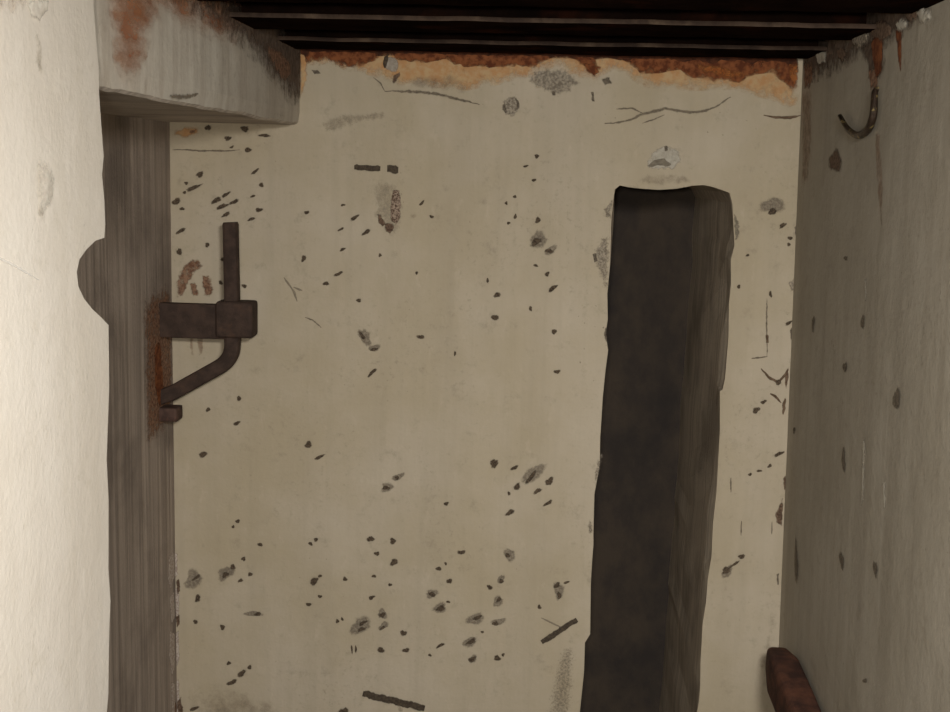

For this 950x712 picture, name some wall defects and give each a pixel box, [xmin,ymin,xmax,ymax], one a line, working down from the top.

rust [113,0,149,66]
rust [170,0,813,103]
peeling [531,70,577,95]
rust [868,37,883,88]
crack [605,97,731,124]
spalling [648,146,680,169]
spalling [377,190,401,233]
rust [145,260,213,439]